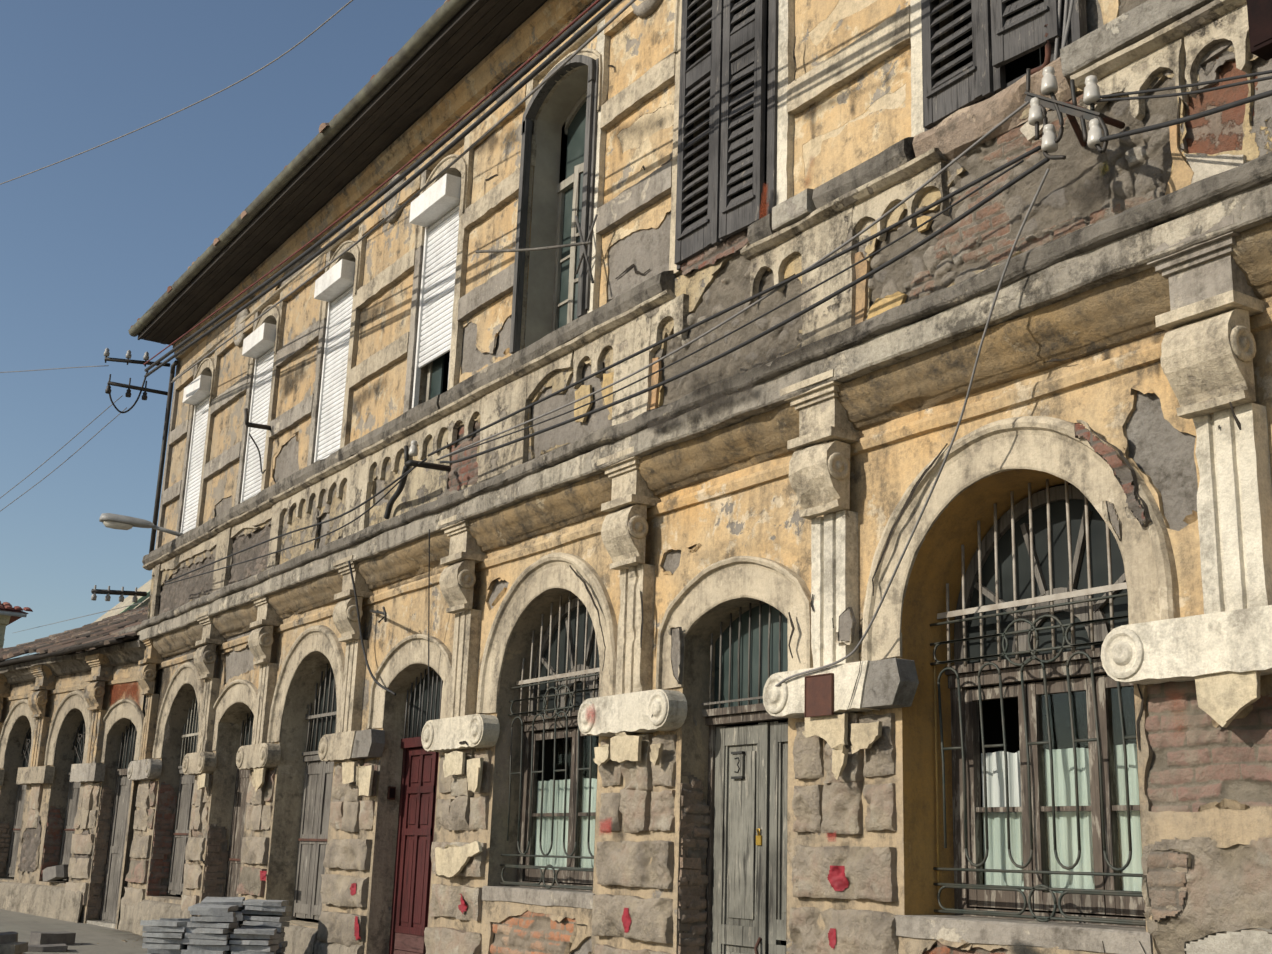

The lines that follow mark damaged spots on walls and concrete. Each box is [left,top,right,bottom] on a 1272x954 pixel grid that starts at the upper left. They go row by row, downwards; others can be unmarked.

flaking render [854,44,1272,325]
flaking render [461,311,512,374]
flaking render [608,206,803,410]
flaking render [1074,384,1198,541]
flaking render [1144,670,1272,812]
flaking render [490,911,592,954]
flaking render [919,938,1015,954]
spalling [1141,837,1272,954]